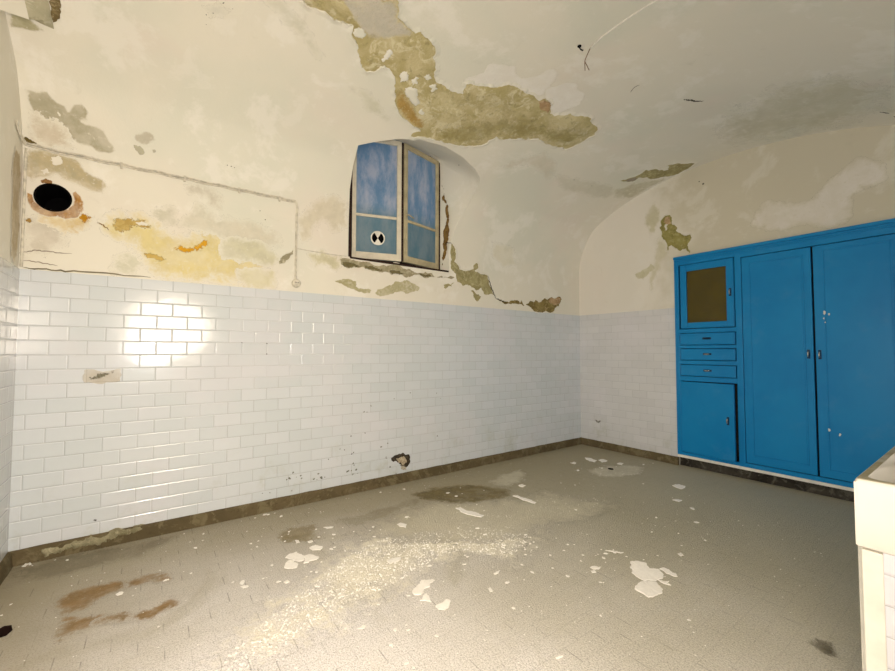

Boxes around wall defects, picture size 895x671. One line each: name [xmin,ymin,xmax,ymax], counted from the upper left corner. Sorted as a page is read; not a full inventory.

flaking render [48,0,64,24]
peeling [298,0,602,151]
damp [712,72,895,148]
peeling [618,161,699,184]
corrosion [26,191,92,237]
damp [97,183,283,290]
peeling [658,213,694,255]
peeling [333,242,563,313]
spalling [391,453,410,470]